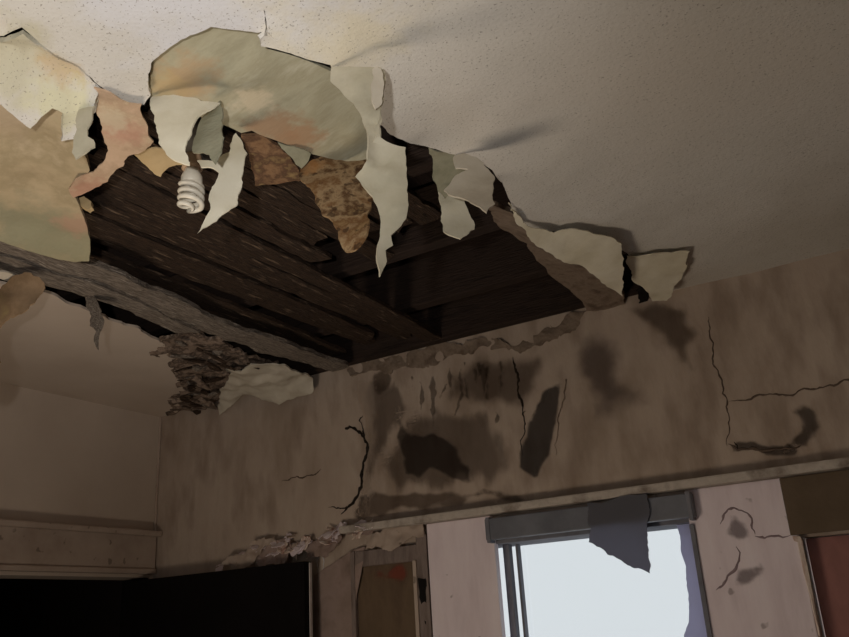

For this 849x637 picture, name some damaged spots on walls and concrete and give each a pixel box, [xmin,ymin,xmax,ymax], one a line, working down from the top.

peeling [72,99,99,160]
peeling [150,95,247,234]
corrosion [299,156,373,253]
peeling [330,66,409,277]
peeling [347,153,689,376]
flaking render [217,363,314,415]
crack [328,416,369,514]
damp [398,429,468,479]
damp [735,409,816,455]
crack [708,320,849,453]
peeling [215,519,424,571]